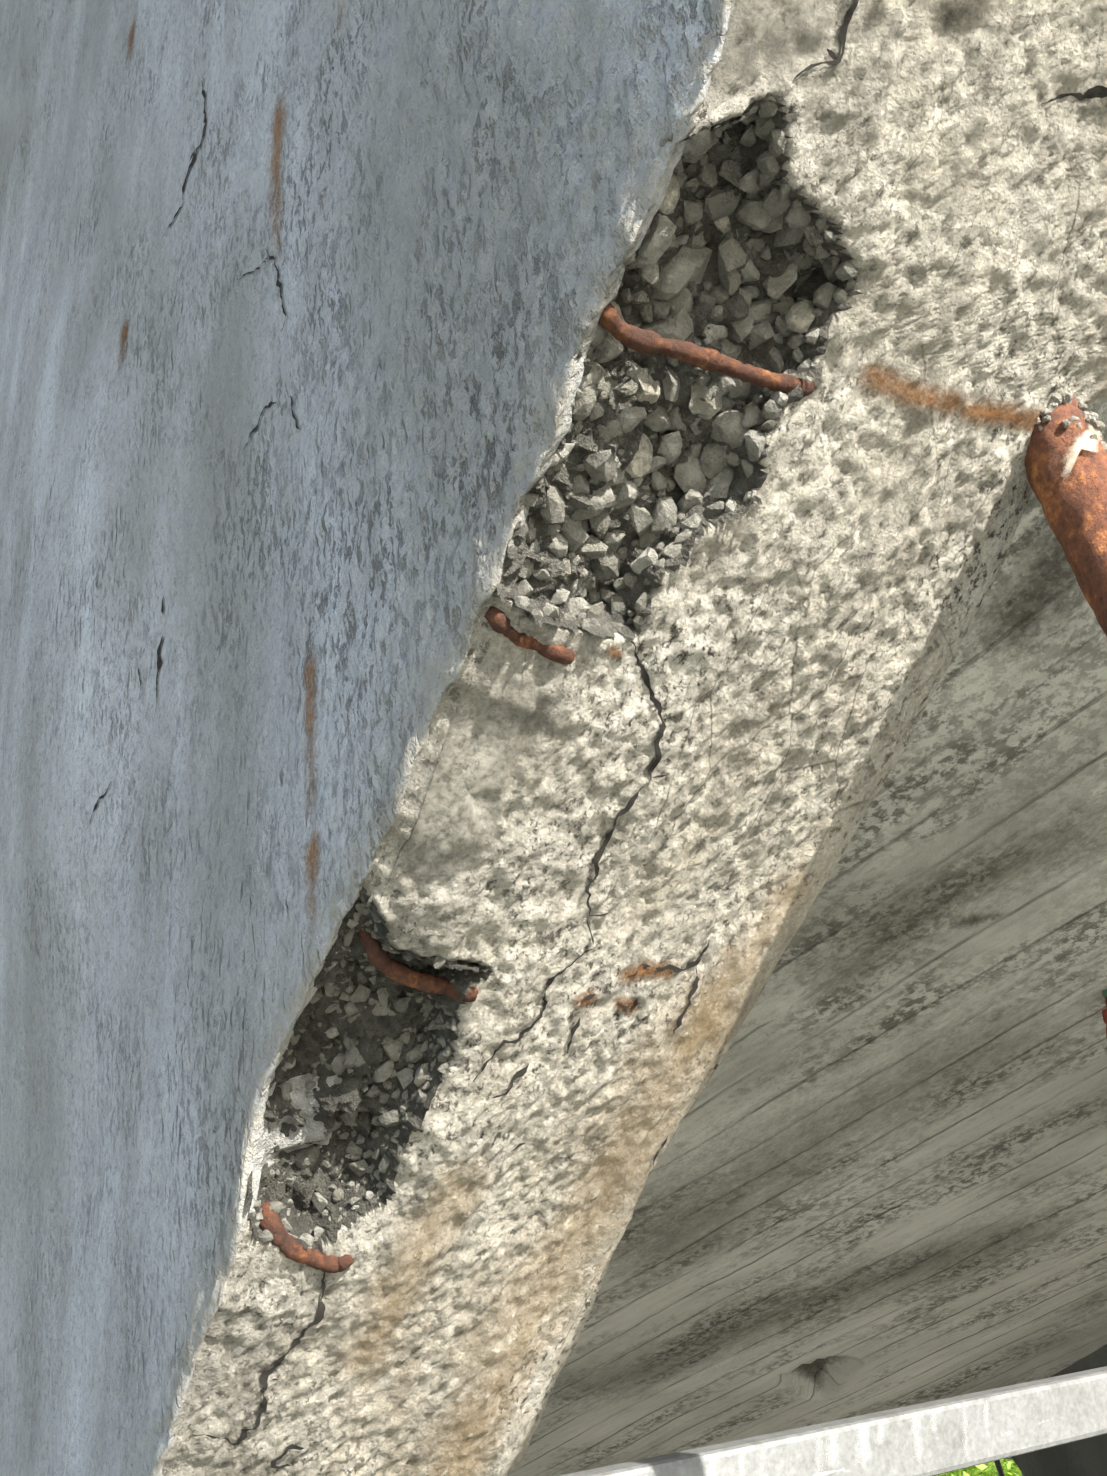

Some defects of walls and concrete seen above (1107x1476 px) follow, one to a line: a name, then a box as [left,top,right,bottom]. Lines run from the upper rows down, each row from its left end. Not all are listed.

crack [162,81,207,237]
rust [271,107,283,227]
crack [793,0,859,80]
crack [1039,85,1107,106]
spalling [494,94,864,638]
rust [862,366,1041,429]
rust [305,658,315,785]
rust [306,837,319,883]
crack [473,641,709,1098]
spalling [245,887,492,1254]
crack [194,1272,326,1469]